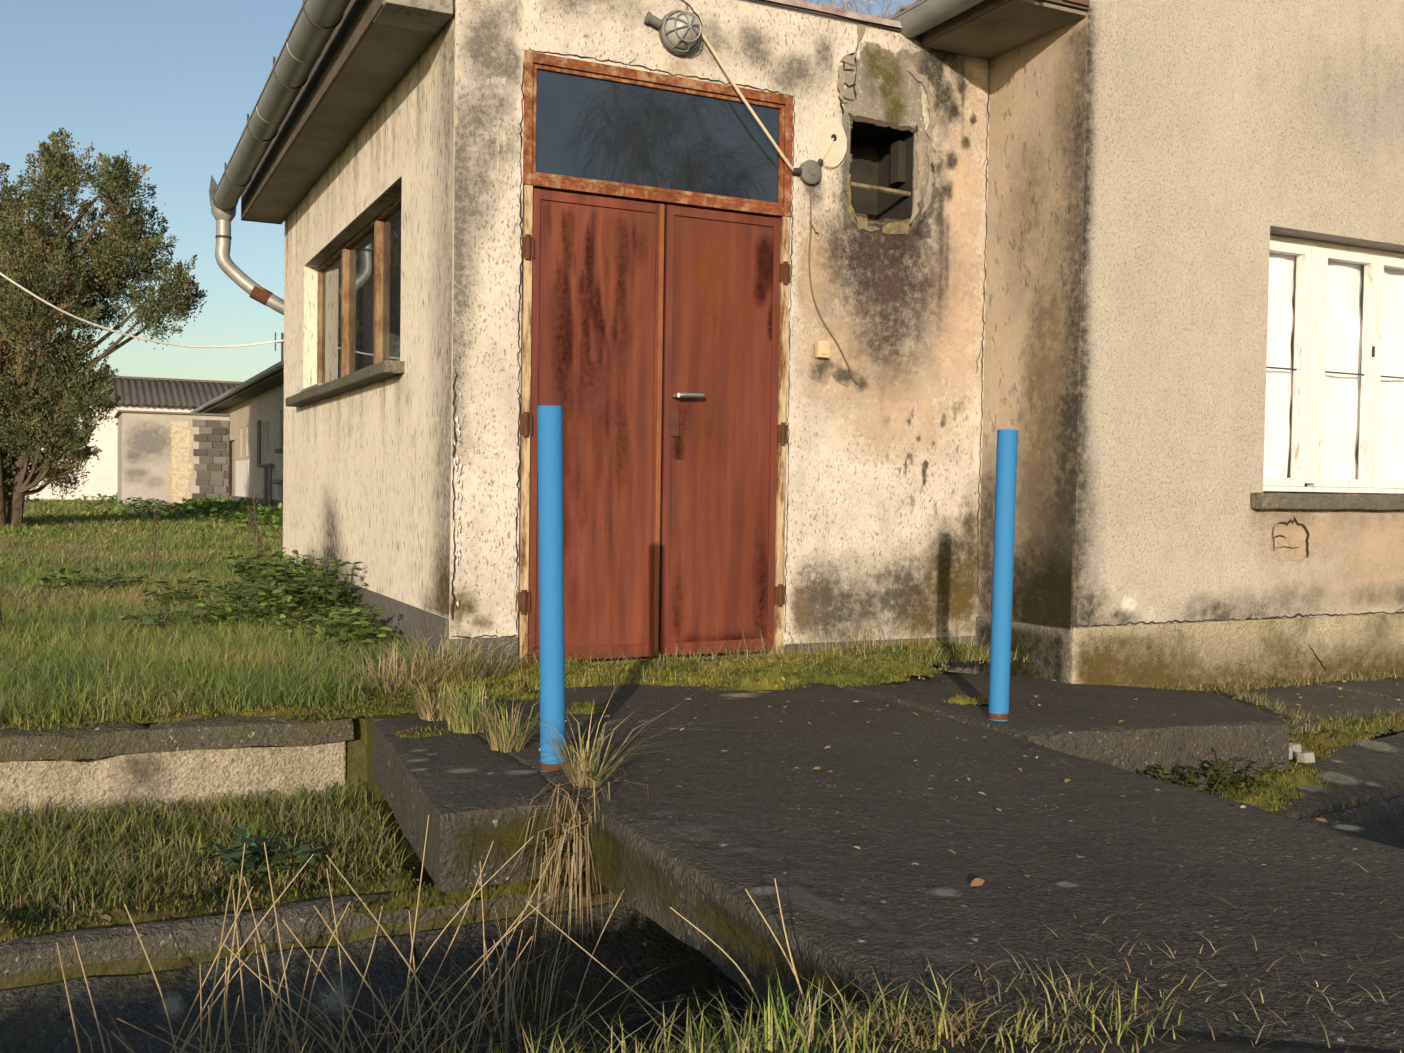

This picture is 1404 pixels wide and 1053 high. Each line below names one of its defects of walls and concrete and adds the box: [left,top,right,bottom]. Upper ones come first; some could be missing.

corrosion [556,219,624,399]
corrosion [756,240,773,340]
leakage [798,41,984,448]
leakage [1012,8,1154,628]
leakage [794,476,995,641]
leakage [1203,602,1231,621]
spalling [1272,517,1310,561]